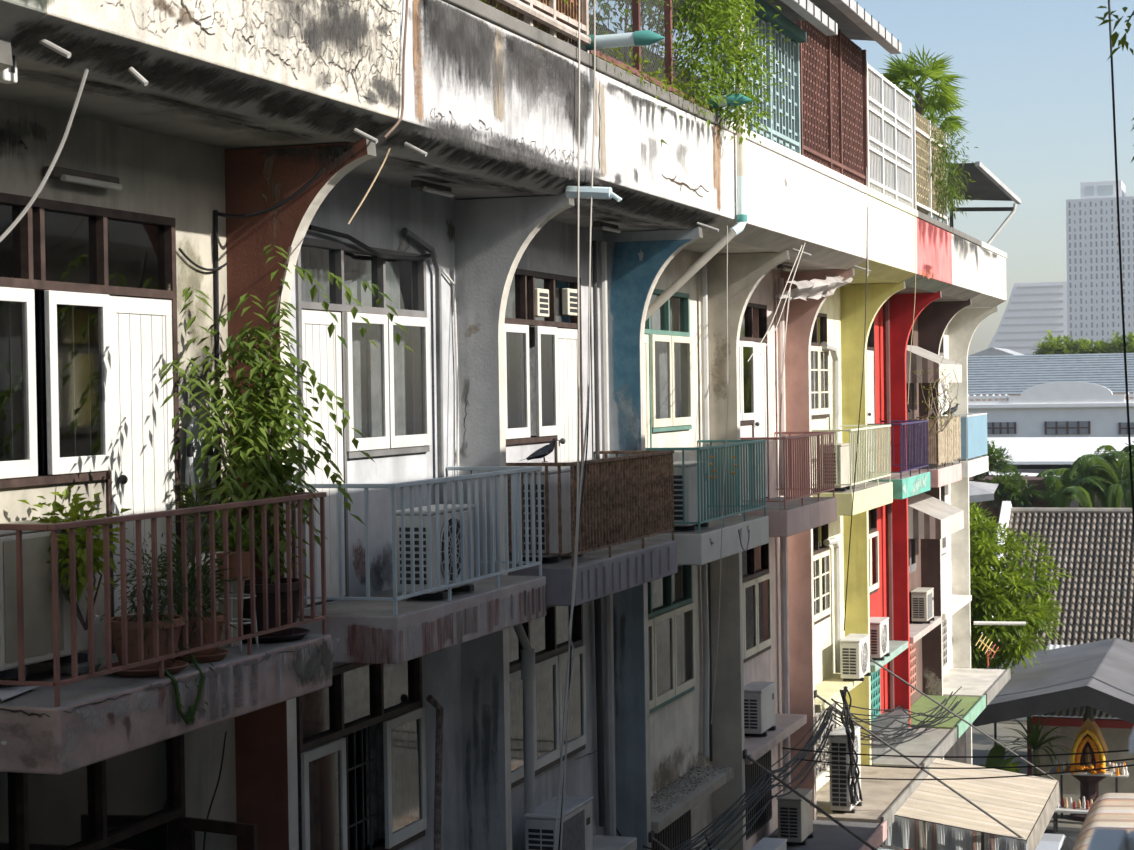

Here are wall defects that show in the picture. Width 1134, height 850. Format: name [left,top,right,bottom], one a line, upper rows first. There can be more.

crack [101,0,402,107]
damp [11,0,716,229]
crack [662,174,709,197]
crack [0,674,205,718]